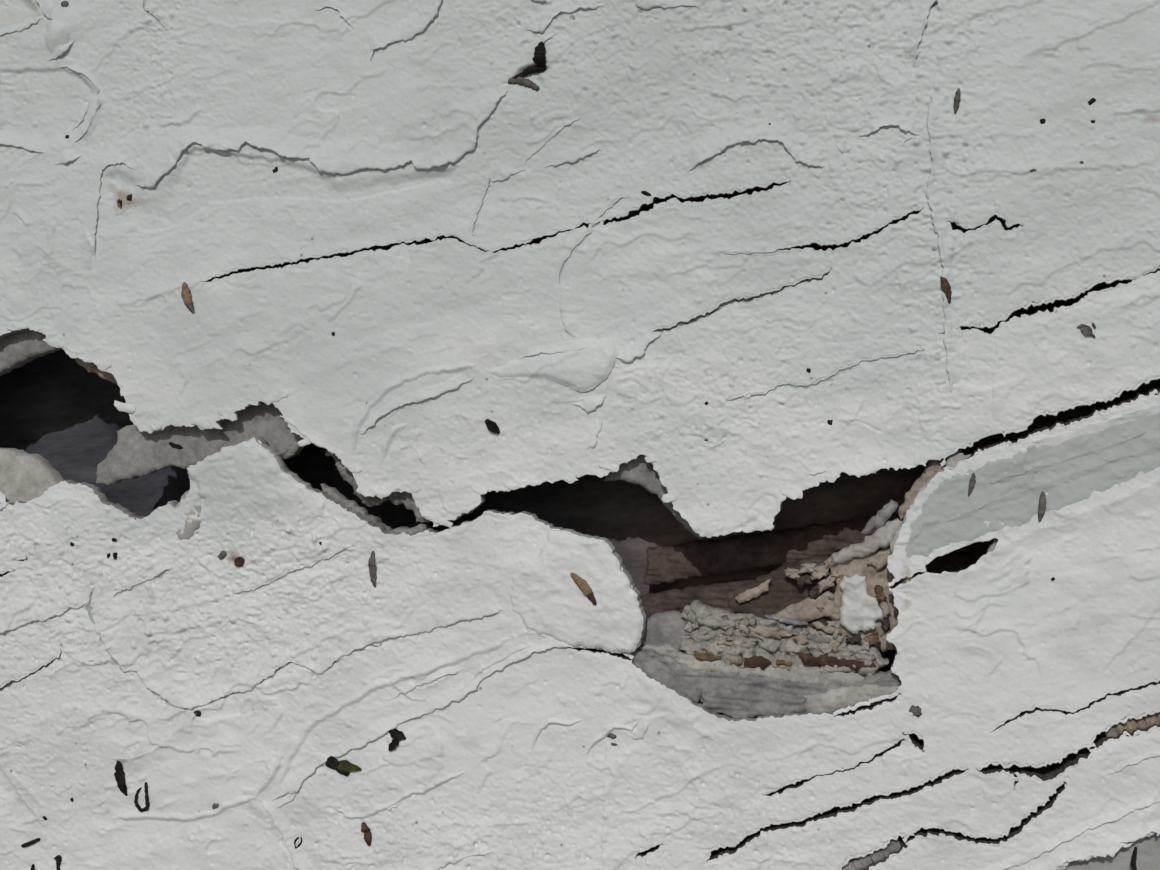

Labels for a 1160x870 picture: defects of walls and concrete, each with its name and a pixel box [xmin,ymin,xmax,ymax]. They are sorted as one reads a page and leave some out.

crack [201,179,790,285]
crack [651,206,1022,335]
peeling [0,321,117,384]
crack [727,266,1160,404]
peeling [191,407,238,429]
peeling [261,393,364,473]
crack [940,376,1160,470]
peeling [604,454,723,539]
peeling [896,404,1160,599]
peeling [839,574,884,634]
crack [705,678,1160,870]
peeling [978,793,1160,870]